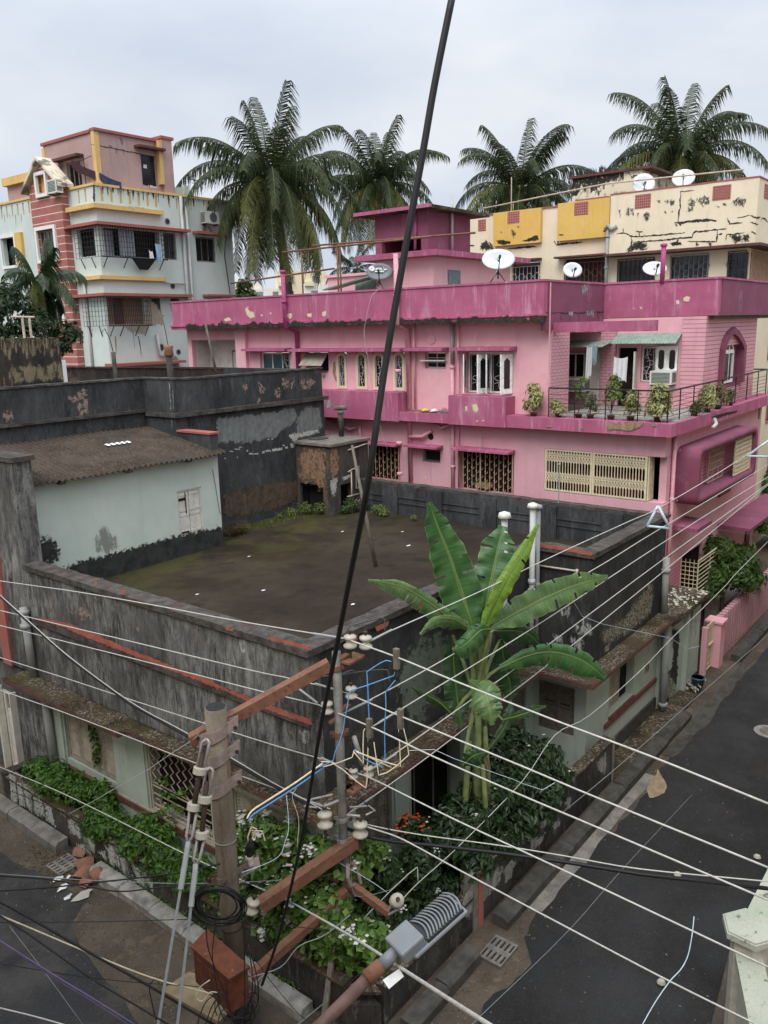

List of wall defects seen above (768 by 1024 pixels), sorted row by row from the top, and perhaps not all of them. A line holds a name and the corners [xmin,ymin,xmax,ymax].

crack [617,190,768,251]
leakage [1,337,64,383]
peeling [68,388,89,416]
peeling [242,362,337,403]
peeling [225,429,319,459]
leakage [40,445,340,579]
peeling [8,771,154,894]